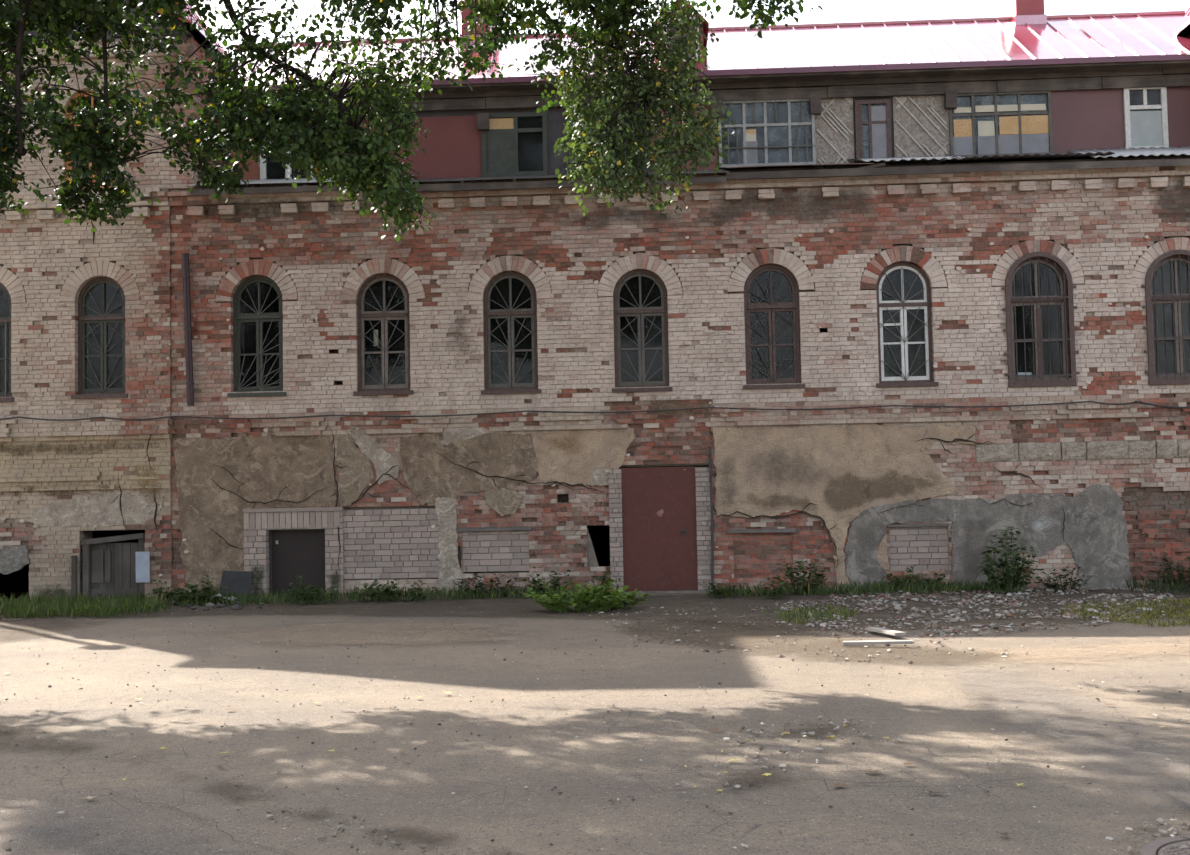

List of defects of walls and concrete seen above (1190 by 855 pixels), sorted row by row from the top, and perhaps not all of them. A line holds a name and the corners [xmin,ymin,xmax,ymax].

flaking render [0,191,1190,596]
crack [208,430,409,570]
crack [436,452,599,491]
leakage [825,472,931,510]